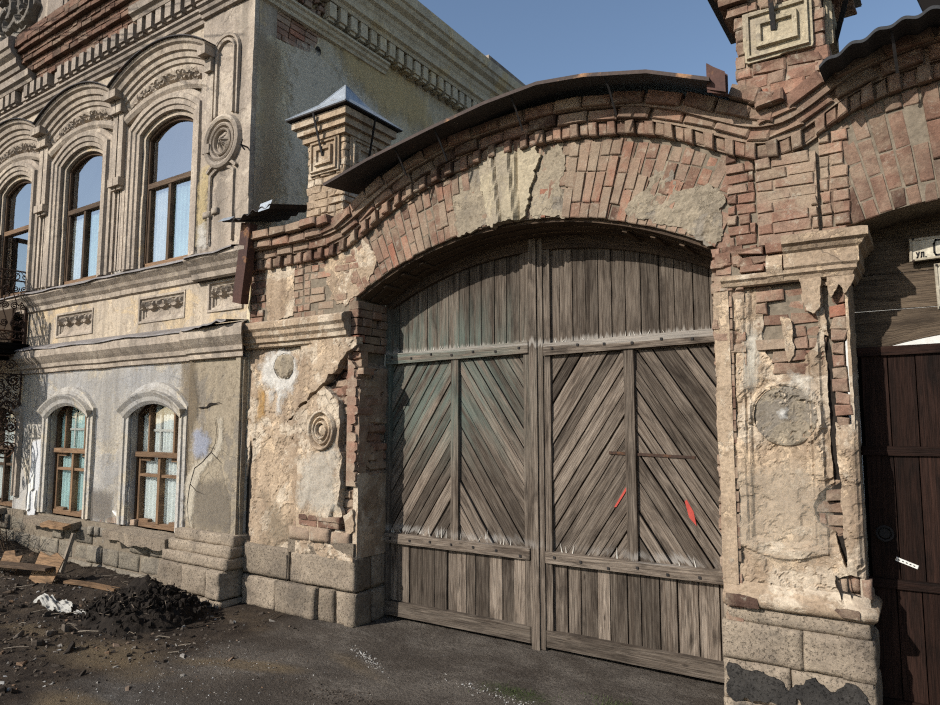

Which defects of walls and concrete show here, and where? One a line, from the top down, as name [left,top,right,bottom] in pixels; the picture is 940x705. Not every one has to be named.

peeling [277,11,380,225]
spalling [435,175,460,238]
spalling [562,138,648,222]
spalling [735,243,784,274]
spalling [755,274,855,425]
spalling [331,351,374,451]
crack [187,402,221,525]
crack [825,327,861,601]
spalling [331,486,366,551]